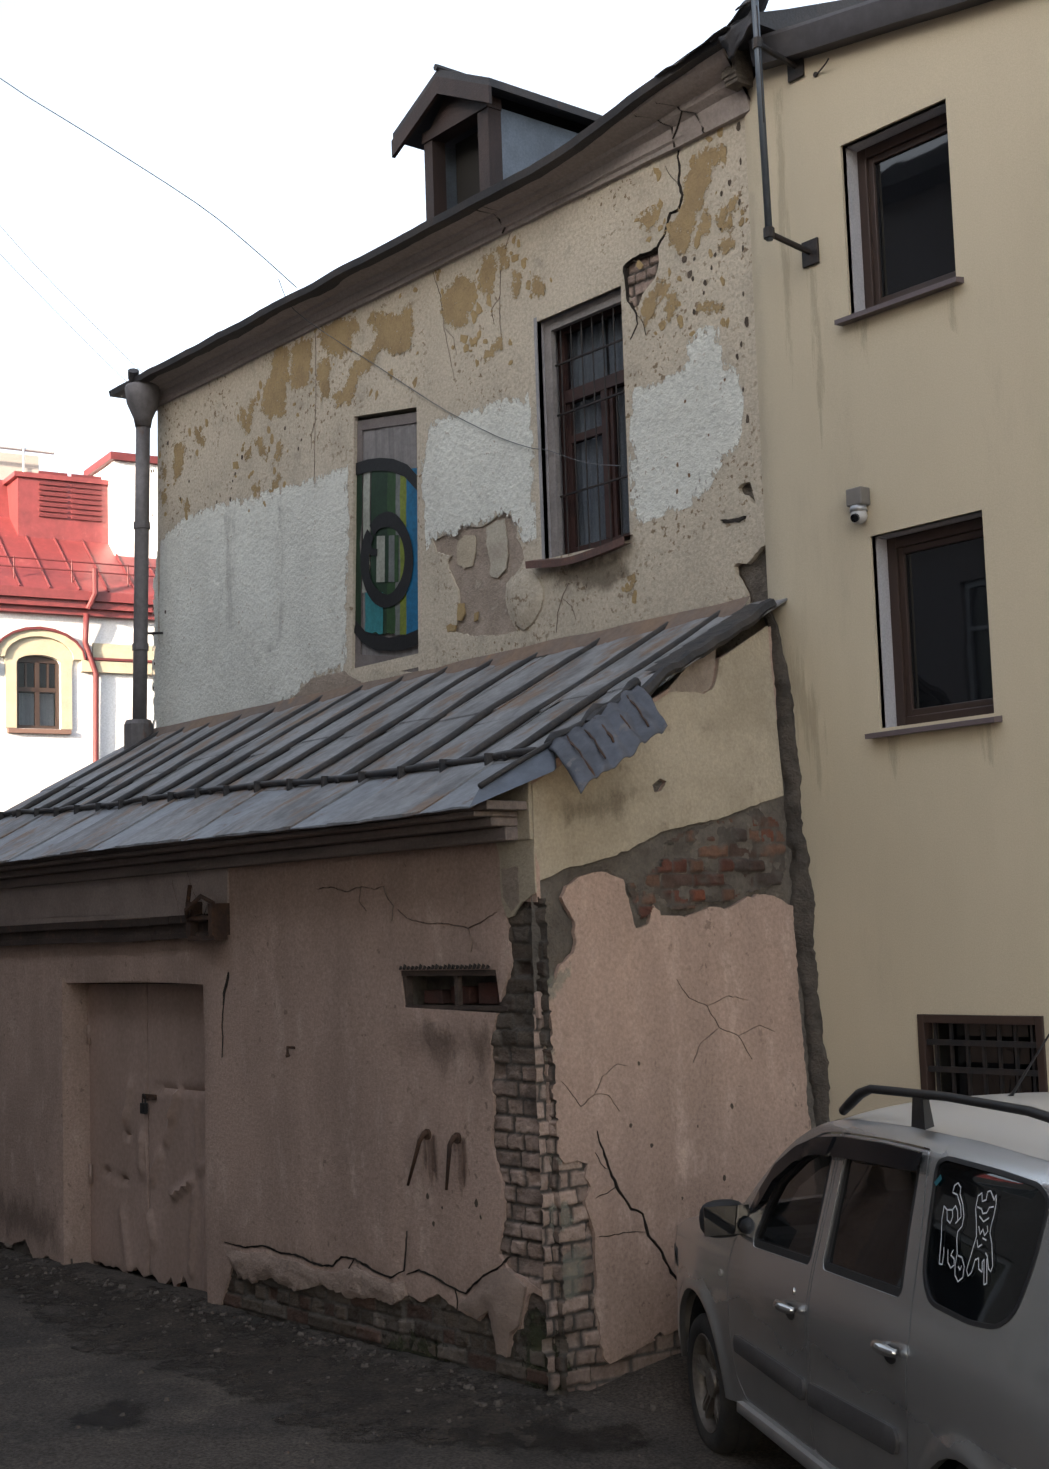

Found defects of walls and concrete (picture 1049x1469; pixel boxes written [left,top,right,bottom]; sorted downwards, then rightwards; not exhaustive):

crack [623,102,705,340]
peeling [627,121,749,360]
flaking render [433,513,524,636]
crack [320,886,496,952]
flaking render [223,549,830,1397]
crack [225,1231,511,1312]
crack [561,1064,677,1281]